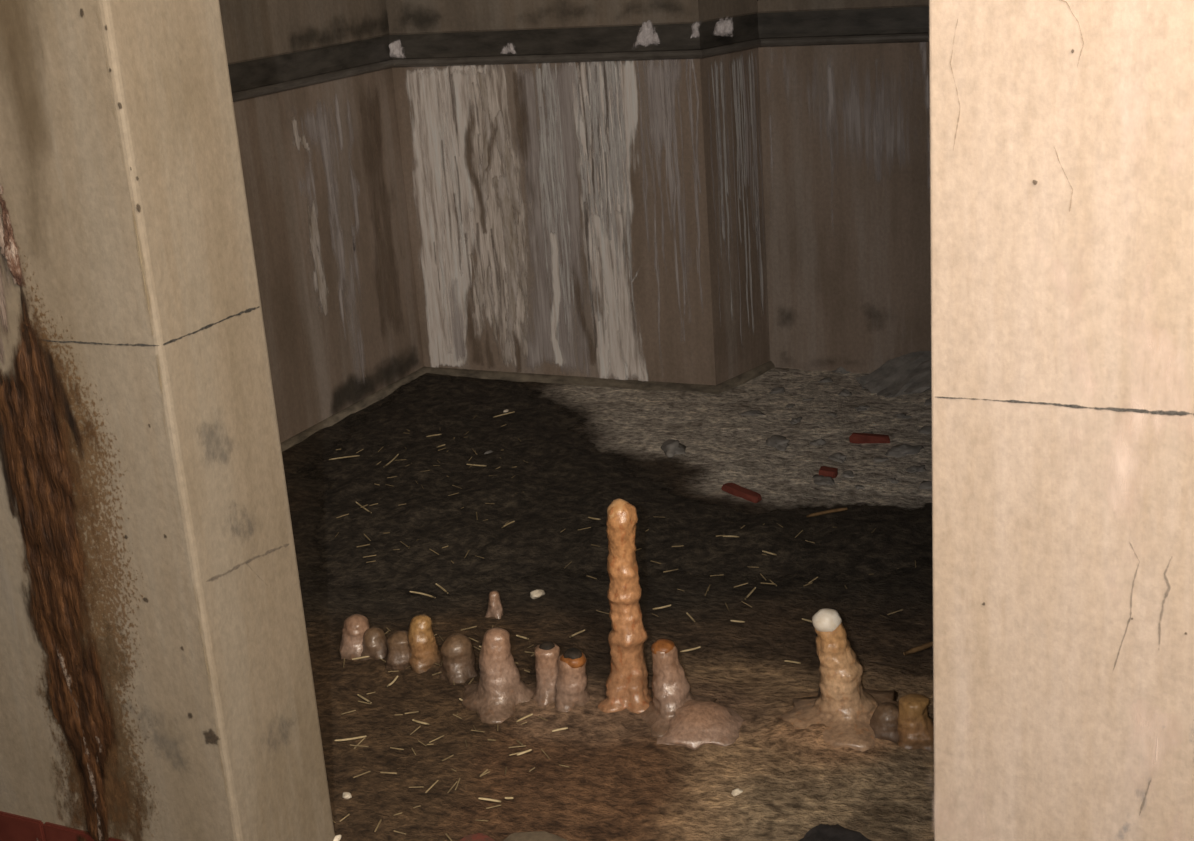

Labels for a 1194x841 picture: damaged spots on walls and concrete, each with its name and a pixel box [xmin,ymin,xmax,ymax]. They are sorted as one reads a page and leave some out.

water stain [820,66,905,179]
water stain [920,42,930,108]
water stain [293,55,772,412]
crack [38,307,259,346]
crack [938,397,1191,416]
corrosion [0,247,156,841]
crack [1114,544,1170,667]